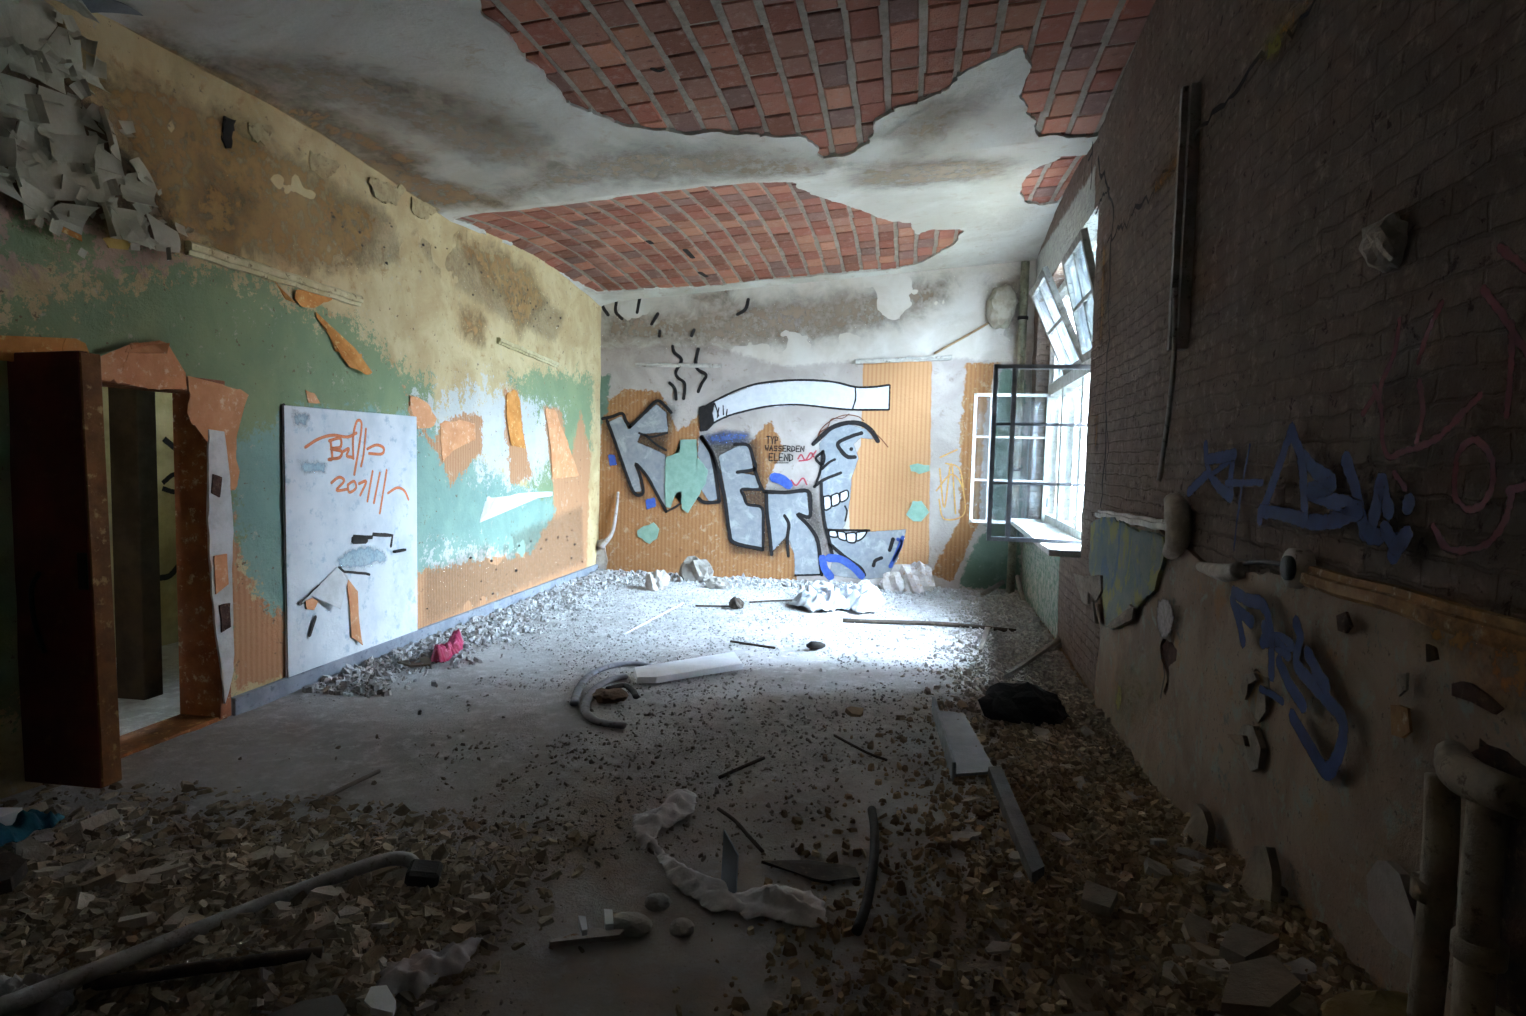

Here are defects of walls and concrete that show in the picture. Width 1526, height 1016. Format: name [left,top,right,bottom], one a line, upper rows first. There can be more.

peeling [0,0,195,261]
flaking render [221,116,275,149]
flaking render [367,177,963,292]
flaking render [481,0,1156,156]
flaking render [1020,155,1085,203]
crack [1088,0,1316,508]
flaking render [1074,517,1177,699]